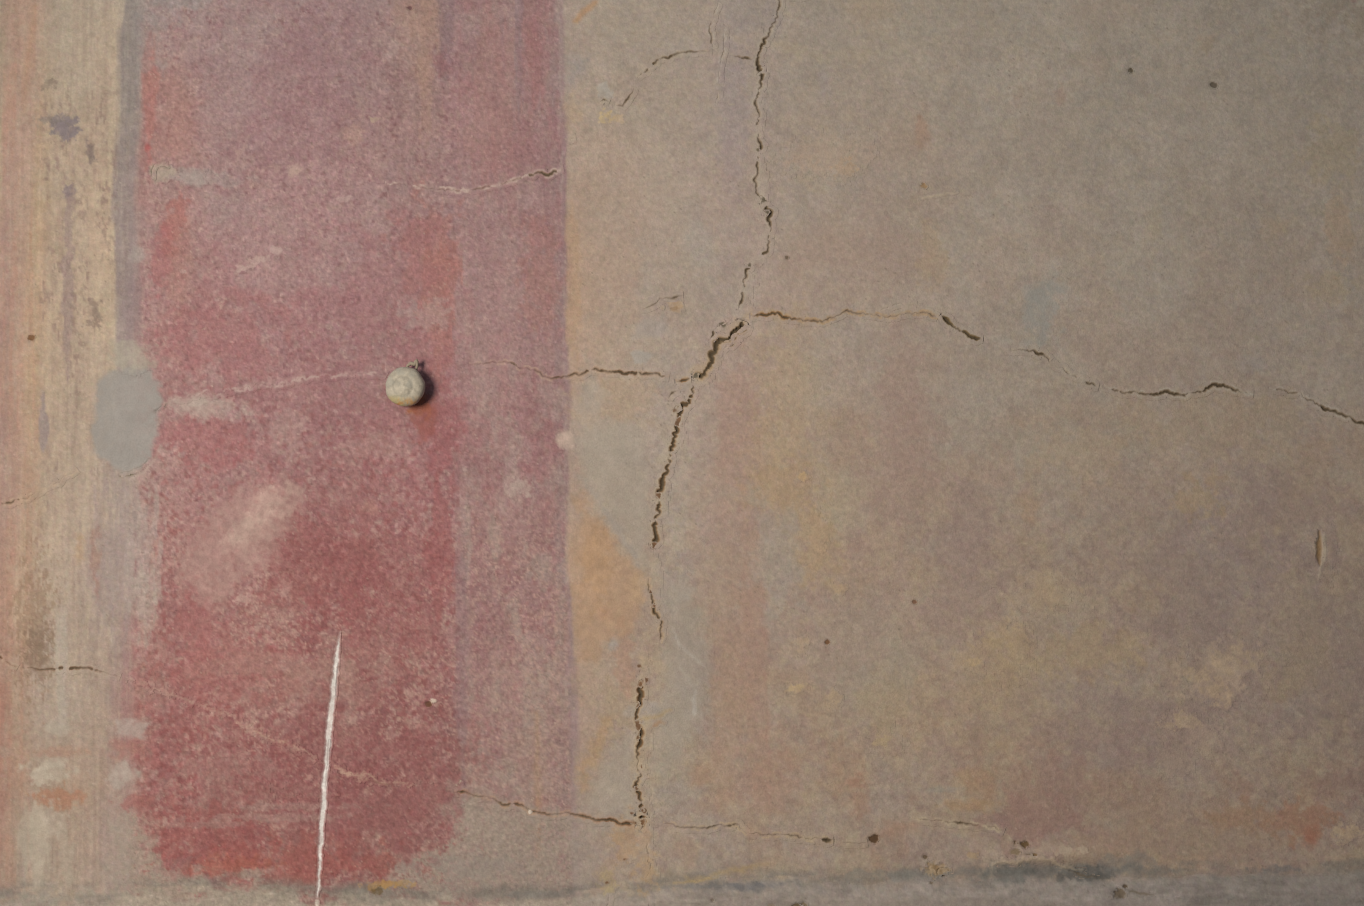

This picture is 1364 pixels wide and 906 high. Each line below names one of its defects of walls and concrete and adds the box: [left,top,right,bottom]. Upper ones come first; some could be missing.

crack [384,133,577,196]
crack [168,368,389,404]
crack [454,0,1364,885]
crack [0,648,122,682]